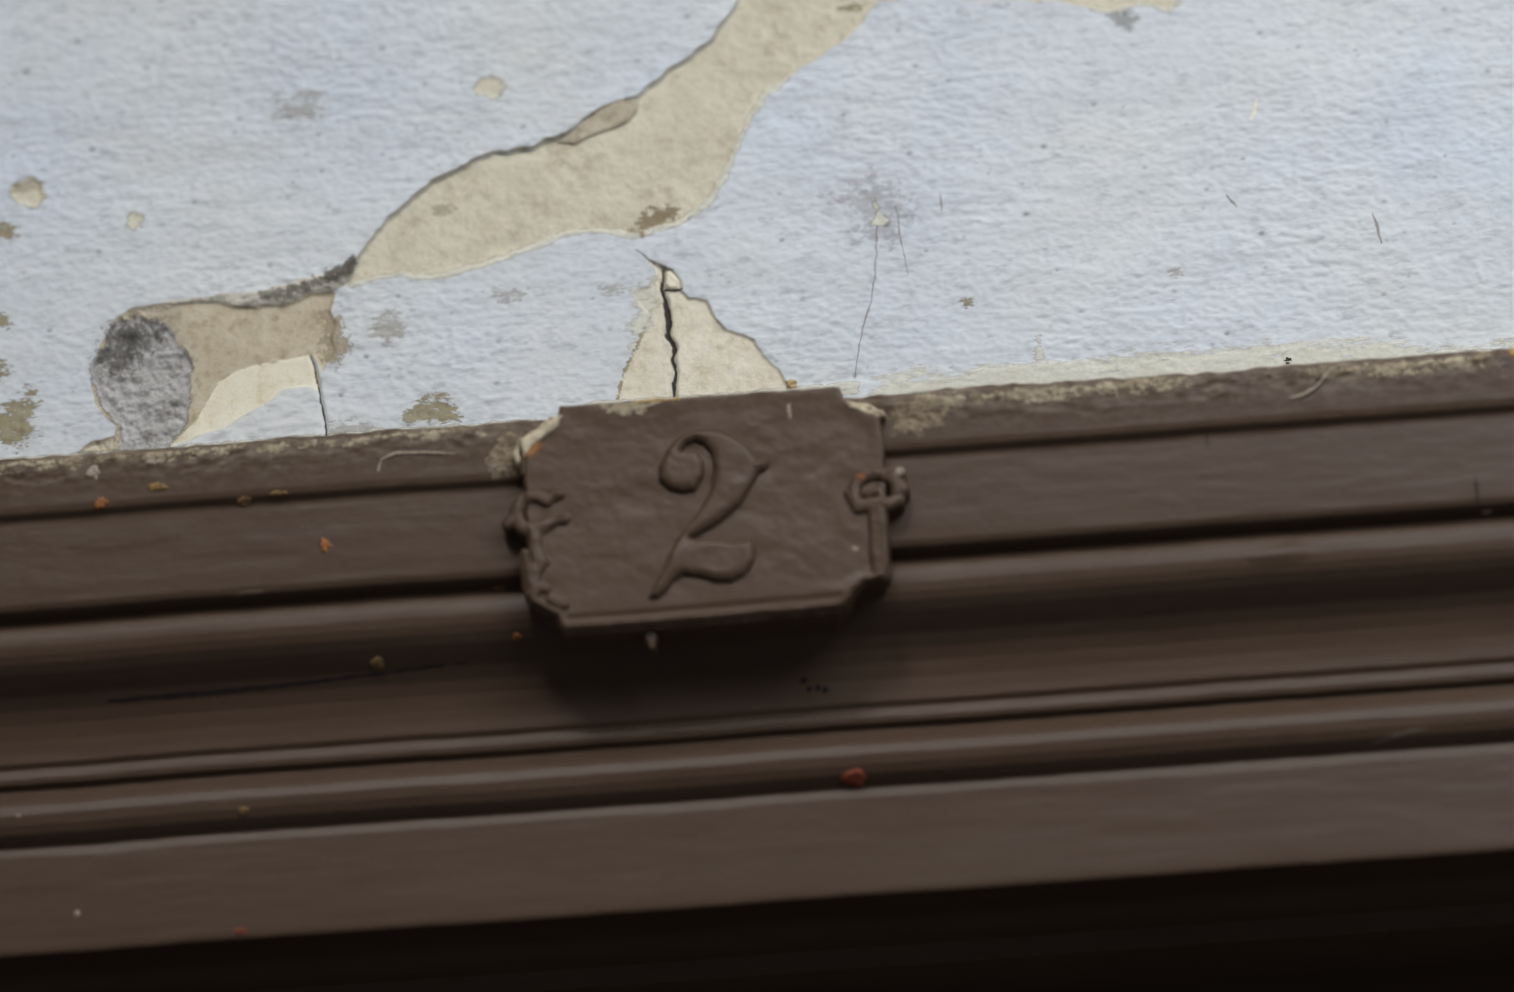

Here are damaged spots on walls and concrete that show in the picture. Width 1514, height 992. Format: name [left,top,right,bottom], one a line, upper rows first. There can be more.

peeling [1028,0,1182,13]
peeling [9,176,47,209]
peeling [77,0,896,454]